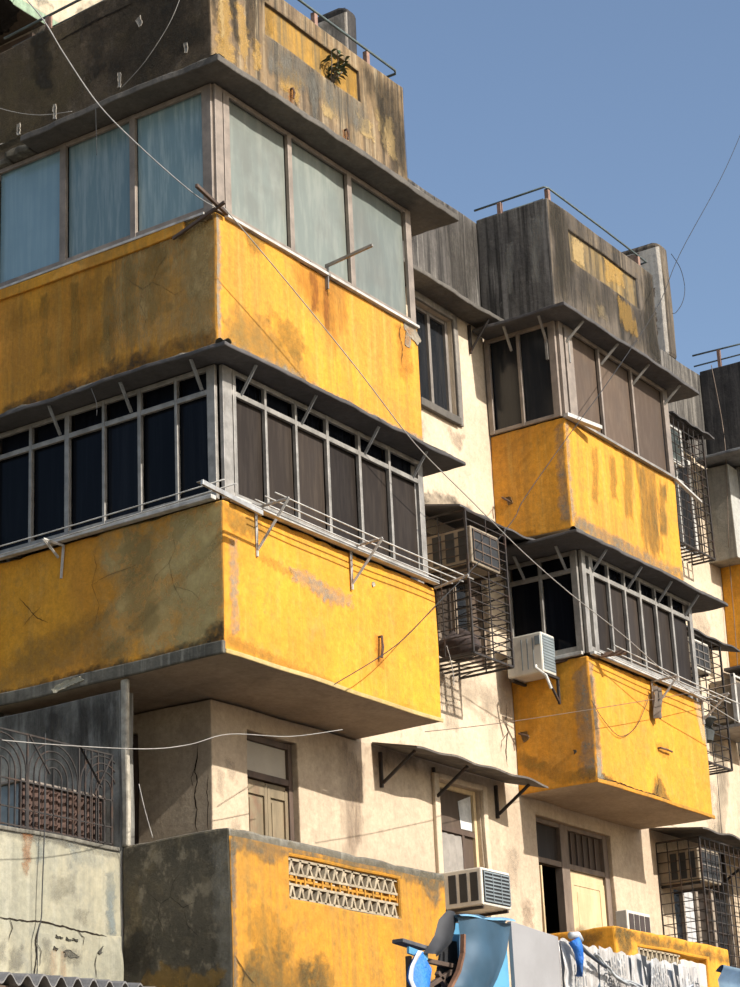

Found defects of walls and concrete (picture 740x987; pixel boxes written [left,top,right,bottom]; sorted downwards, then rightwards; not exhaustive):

leakage [267,16,362,128]
leakage [366,69,413,183]
peeling [572,237,584,266]
peeling [605,258,638,337]
crack [191,747,209,830]
crack [0,917,107,974]